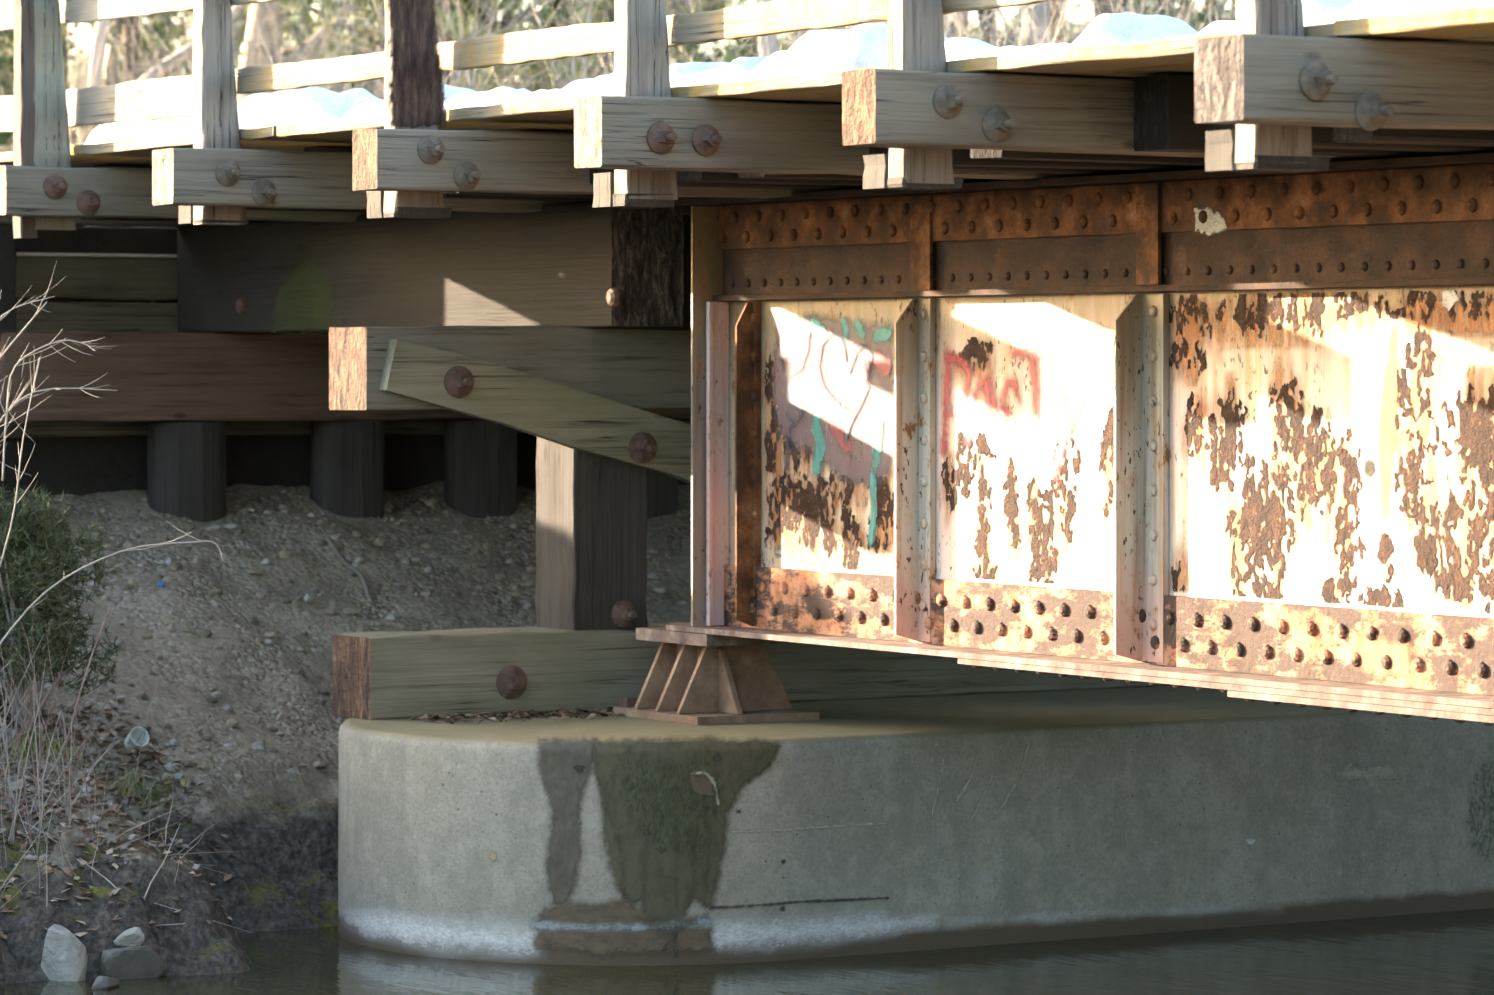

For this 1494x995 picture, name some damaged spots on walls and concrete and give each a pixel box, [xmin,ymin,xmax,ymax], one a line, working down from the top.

corrosion [951,337,993,378]
corrosion [764,354,894,570]
corrosion [940,431,1080,584]
corrosion [1098,405,1114,522]
corrosion [1169,290,1494,614]
corrosion [1357,636,1409,679]
water stain [538,738,597,904]